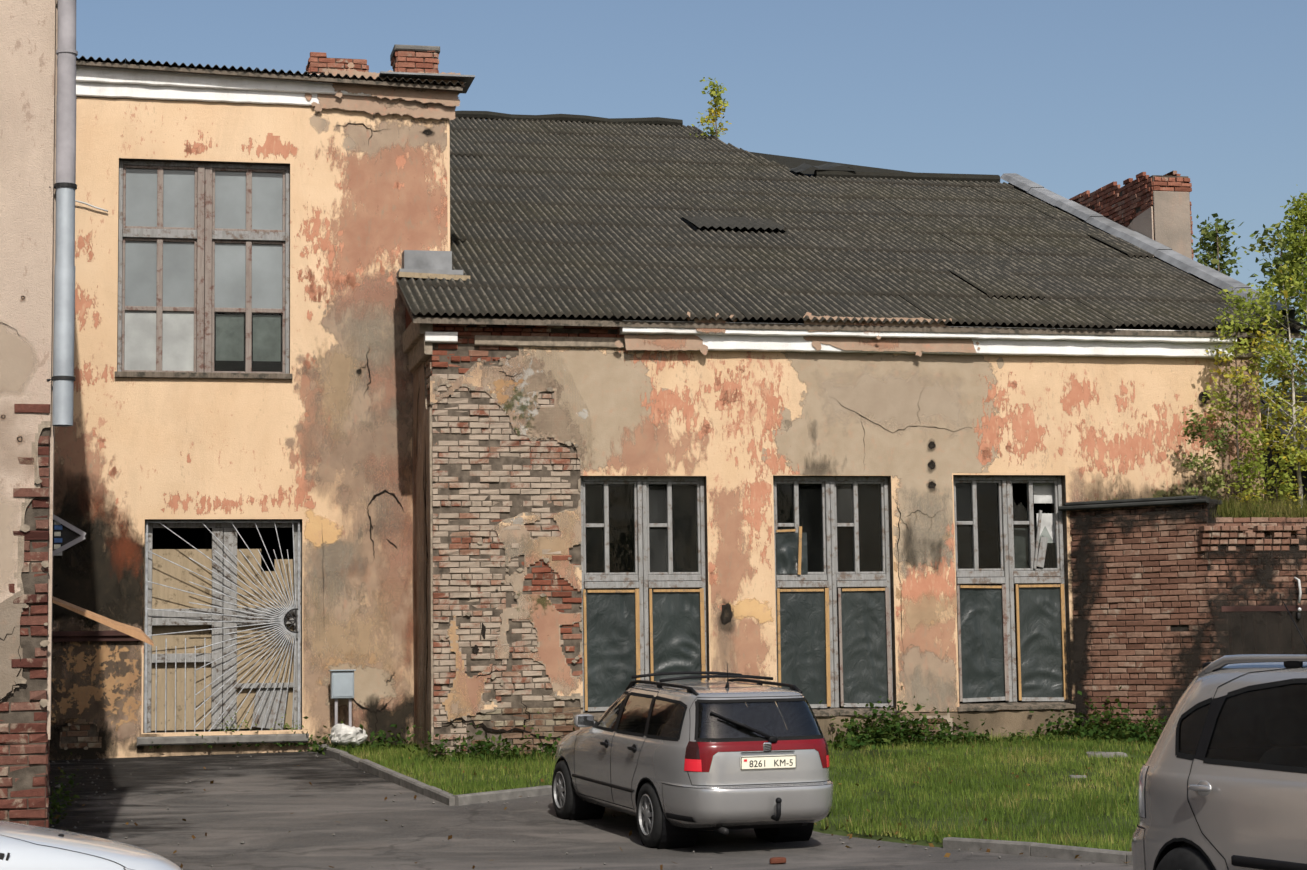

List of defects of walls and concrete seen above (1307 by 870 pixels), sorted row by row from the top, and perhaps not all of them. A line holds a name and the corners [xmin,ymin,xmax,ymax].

peeling [75,231,97,262]
peeling [75,284,104,331]
flaking render [161,62,465,547]
spalling [14,404,50,413]
peeling [74,359,114,393]
crack [831,394,976,468]
leakage [52,479,144,631]
flaking render [431,312,1259,757]
peeling [0,422,155,827]
leakage [1061,474,1307,730]
crack [0,629,22,701]
leakage [49,719,115,760]